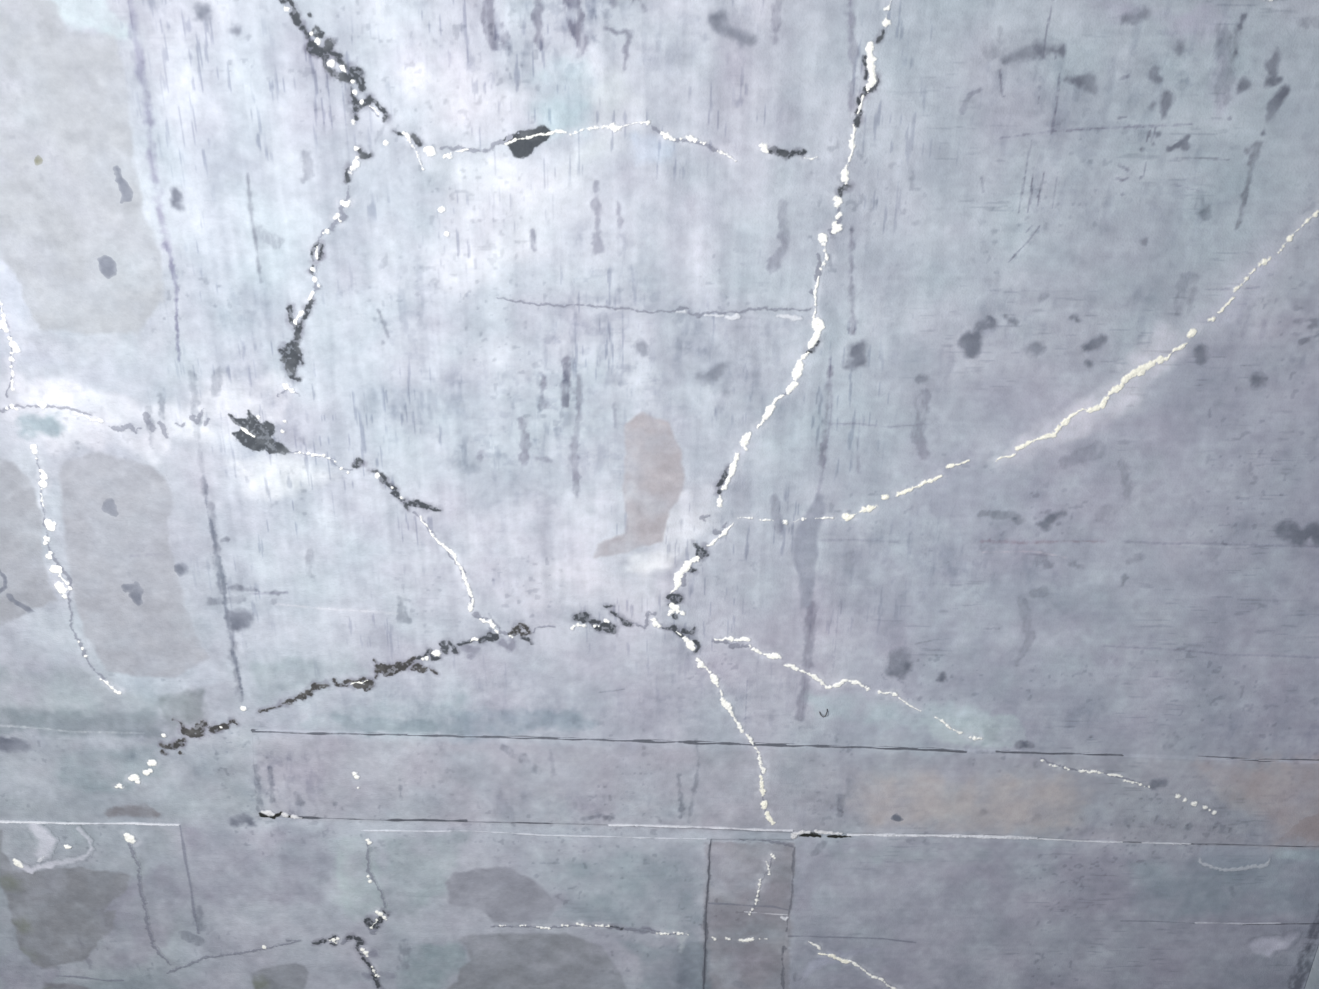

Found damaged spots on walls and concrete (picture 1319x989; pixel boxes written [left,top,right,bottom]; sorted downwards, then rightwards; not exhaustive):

crack [0,301,211,439]
damp [592,410,687,560]
crack [114,0,1319,826]
crack [29,444,123,695]
crack [123,832,397,989]
crack [490,852,776,942]
crack [807,941,899,989]